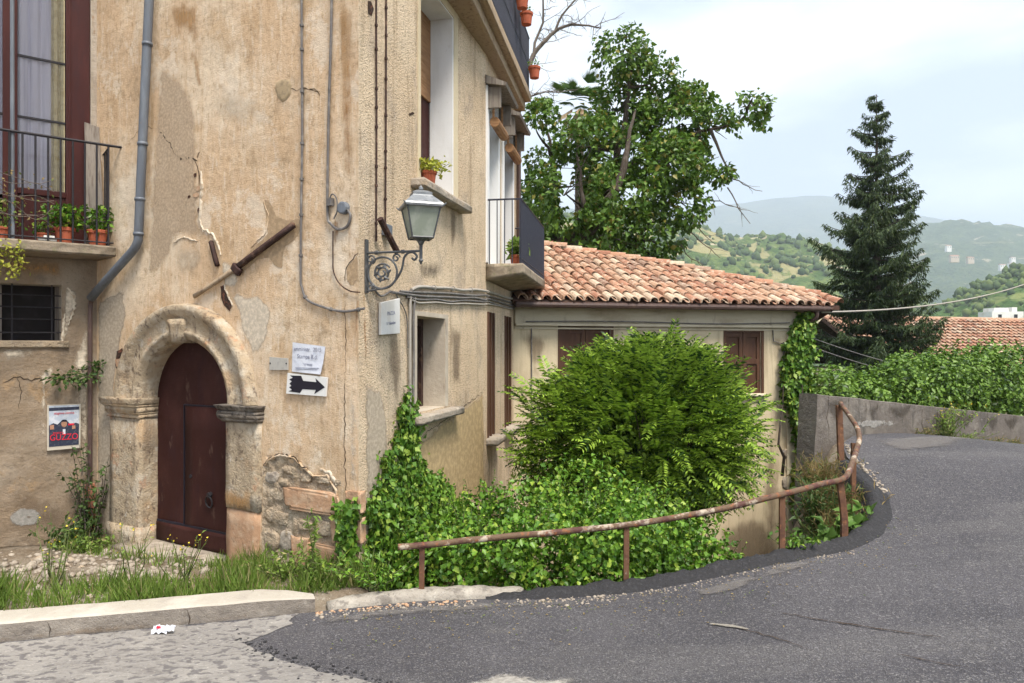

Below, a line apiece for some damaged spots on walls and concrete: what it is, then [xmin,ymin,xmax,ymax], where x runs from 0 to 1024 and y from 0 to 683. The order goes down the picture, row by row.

crack [130,126,200,180]
peeling [151,73,300,350]
crack [4,376,41,407]
flaking render [261,388,387,570]